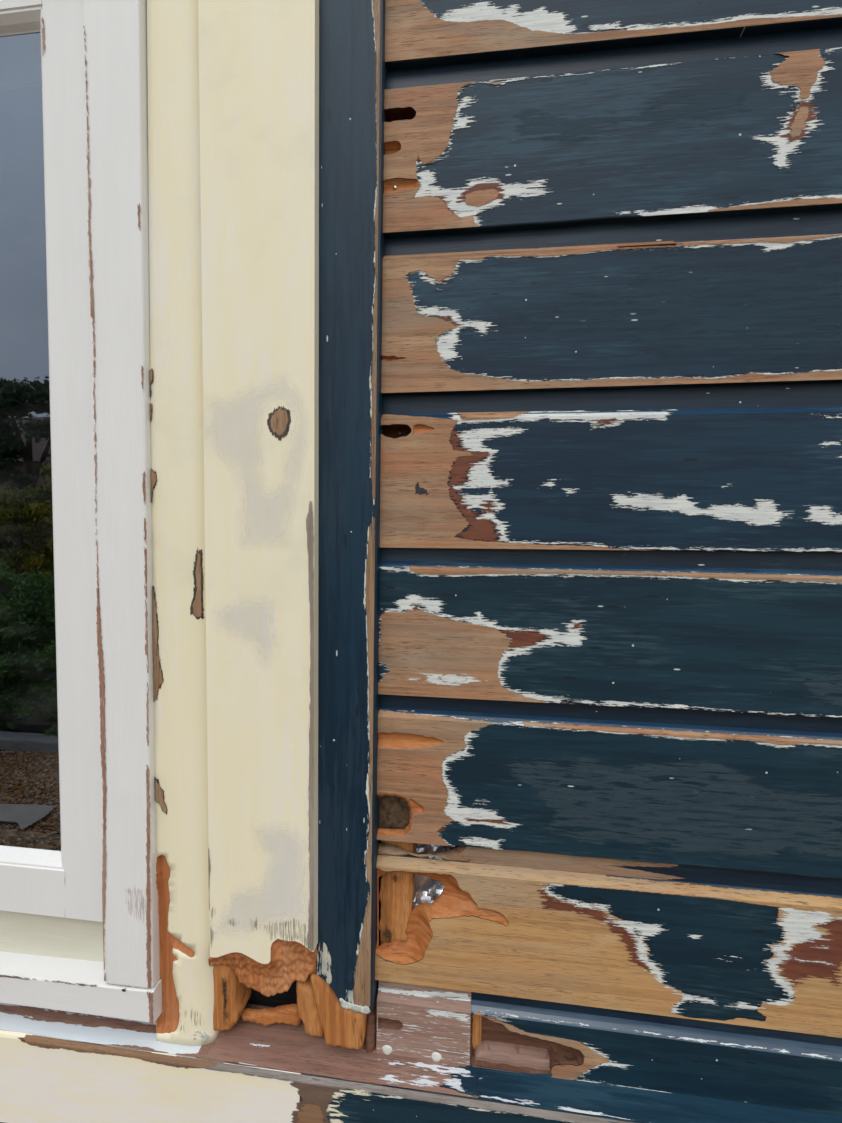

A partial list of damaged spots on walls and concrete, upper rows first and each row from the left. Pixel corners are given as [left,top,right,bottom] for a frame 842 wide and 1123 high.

peeling [190,547,204,619]
peeling [346,0,842,1093]
peeling [0,766,540,1123]
peeling [544,1106,630,1123]